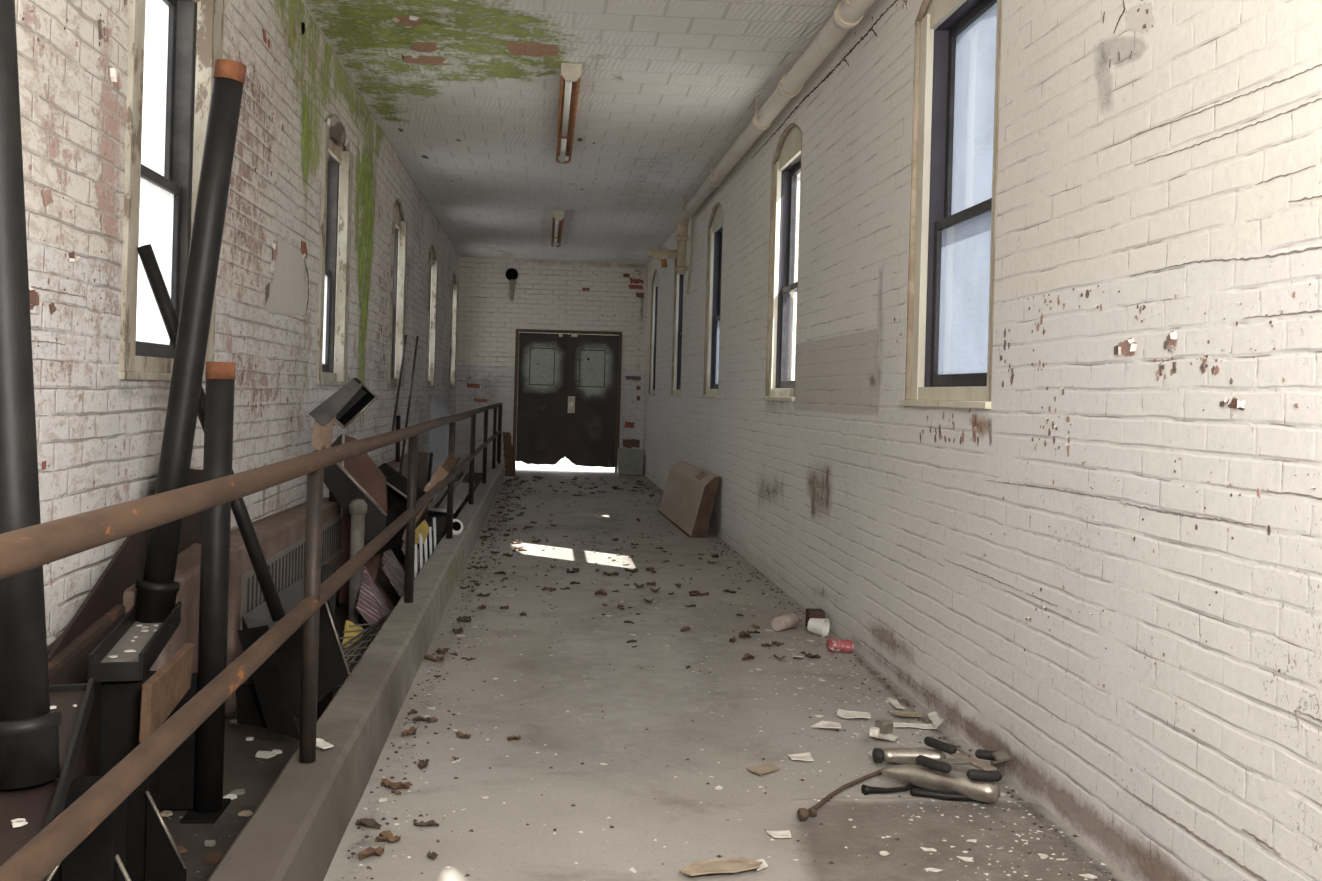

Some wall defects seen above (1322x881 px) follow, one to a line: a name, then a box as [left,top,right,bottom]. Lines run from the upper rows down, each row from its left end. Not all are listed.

crack [1135,64,1322,165]
spalling [24,164,76,218]
crack [1255,166,1322,202]
crack [1129,247,1322,277]
spalling [29,278,77,328]
spalling [920,408,992,446]
crack [986,480,1266,527]
crack [1270,491,1322,500]
crack [1294,710,1322,724]